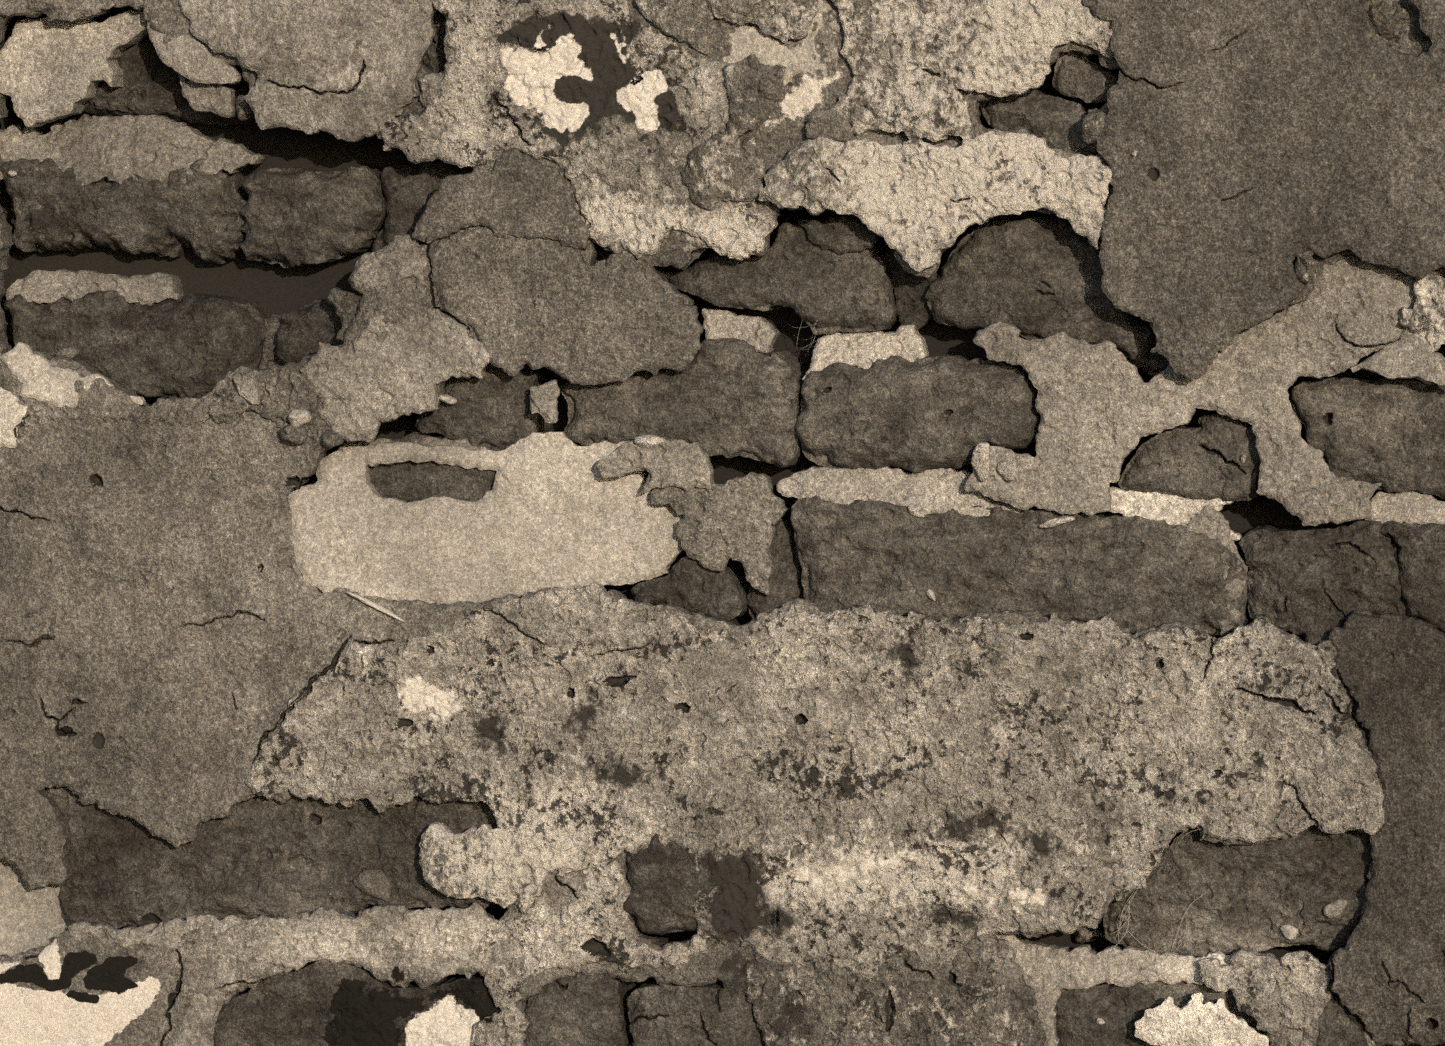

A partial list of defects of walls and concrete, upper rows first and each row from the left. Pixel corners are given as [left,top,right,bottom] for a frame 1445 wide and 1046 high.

spalling [0,0,1445,646]
crack [14,415,29,438]
crack [0,506,49,521]
crack [5,635,54,647]
crack [40,698,87,736]
crack [253,635,394,763]
spalling [0,786,572,957]
spalling [623,833,716,935]
spalling [995,824,1372,1046]
spalling [213,960,501,1046]
spalling [524,937,765,1046]